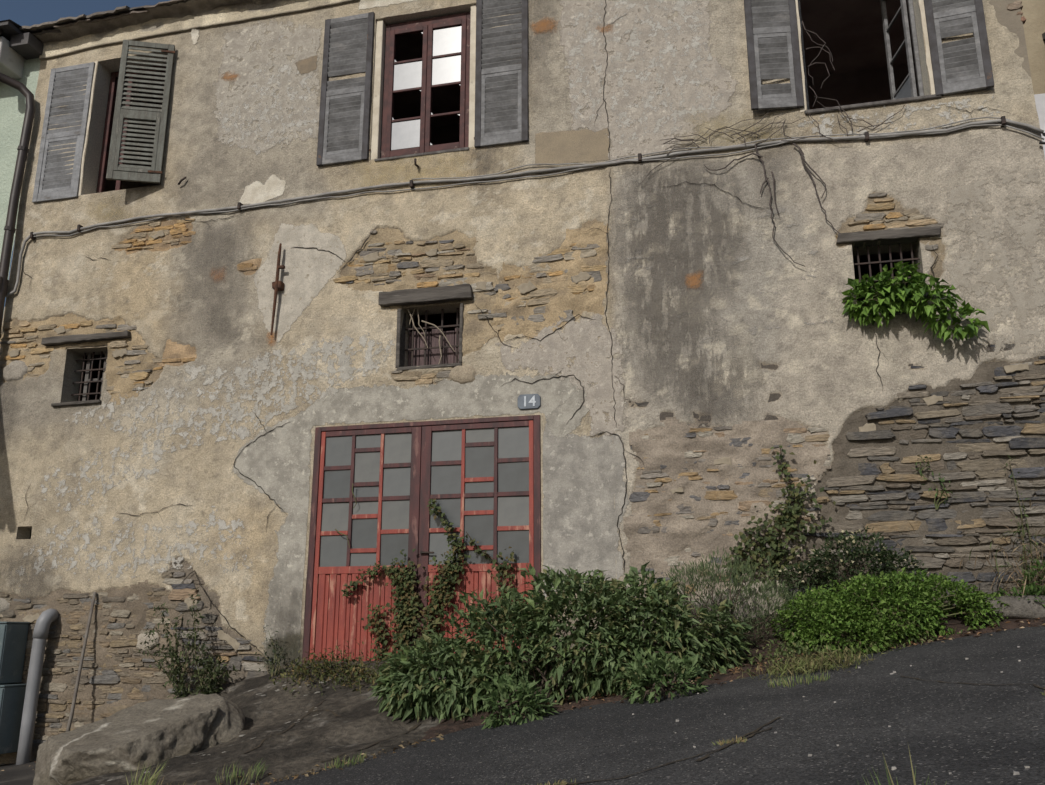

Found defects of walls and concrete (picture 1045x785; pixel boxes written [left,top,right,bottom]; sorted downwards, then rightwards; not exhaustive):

spalling [111,217,196,255]
spalling [0,312,453,761]
spalling [237,258,262,275]
crack [233,411,291,533]
crack [479,0,645,572]
spalling [333,168,1045,605]